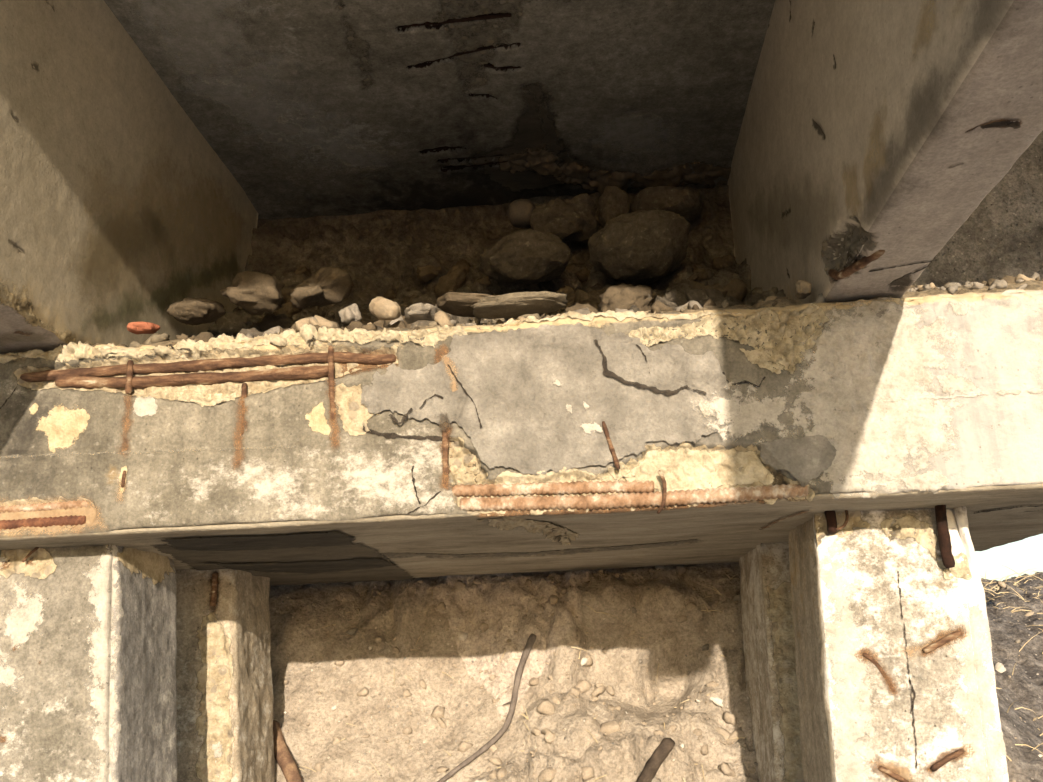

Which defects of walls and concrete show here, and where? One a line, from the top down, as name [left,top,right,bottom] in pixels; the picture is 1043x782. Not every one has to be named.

spalling [395,0,532,99]
spalling [821,217,885,281]
spalling [0,284,742,499]
crack [594,340,766,396]
spalling [0,496,101,533]
crack [407,466,441,514]
peeling [381,273,972,782]
crack [897,571,917,769]
peeling [905,604,1007,782]